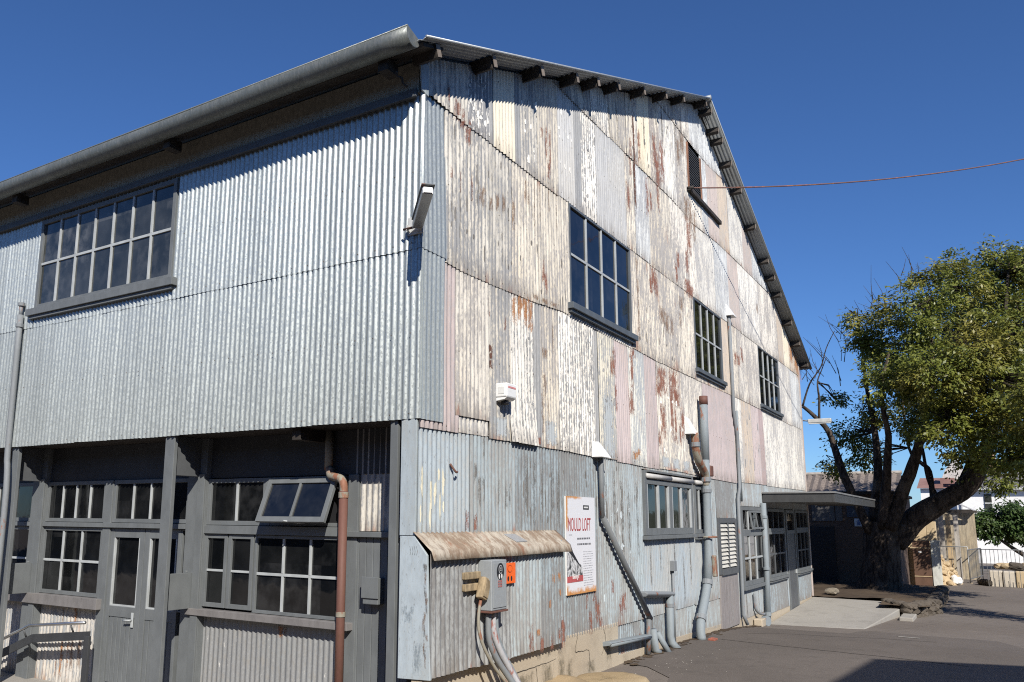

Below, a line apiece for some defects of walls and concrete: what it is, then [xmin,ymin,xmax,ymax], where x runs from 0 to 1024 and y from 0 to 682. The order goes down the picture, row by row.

peeling [469,74,490,143]
peeling [451,162,509,239]
rust [626,112,684,215]
rust [504,261,555,331]
rust [659,197,696,335]
peeling [559,296,617,446]
rust [656,368,685,446]